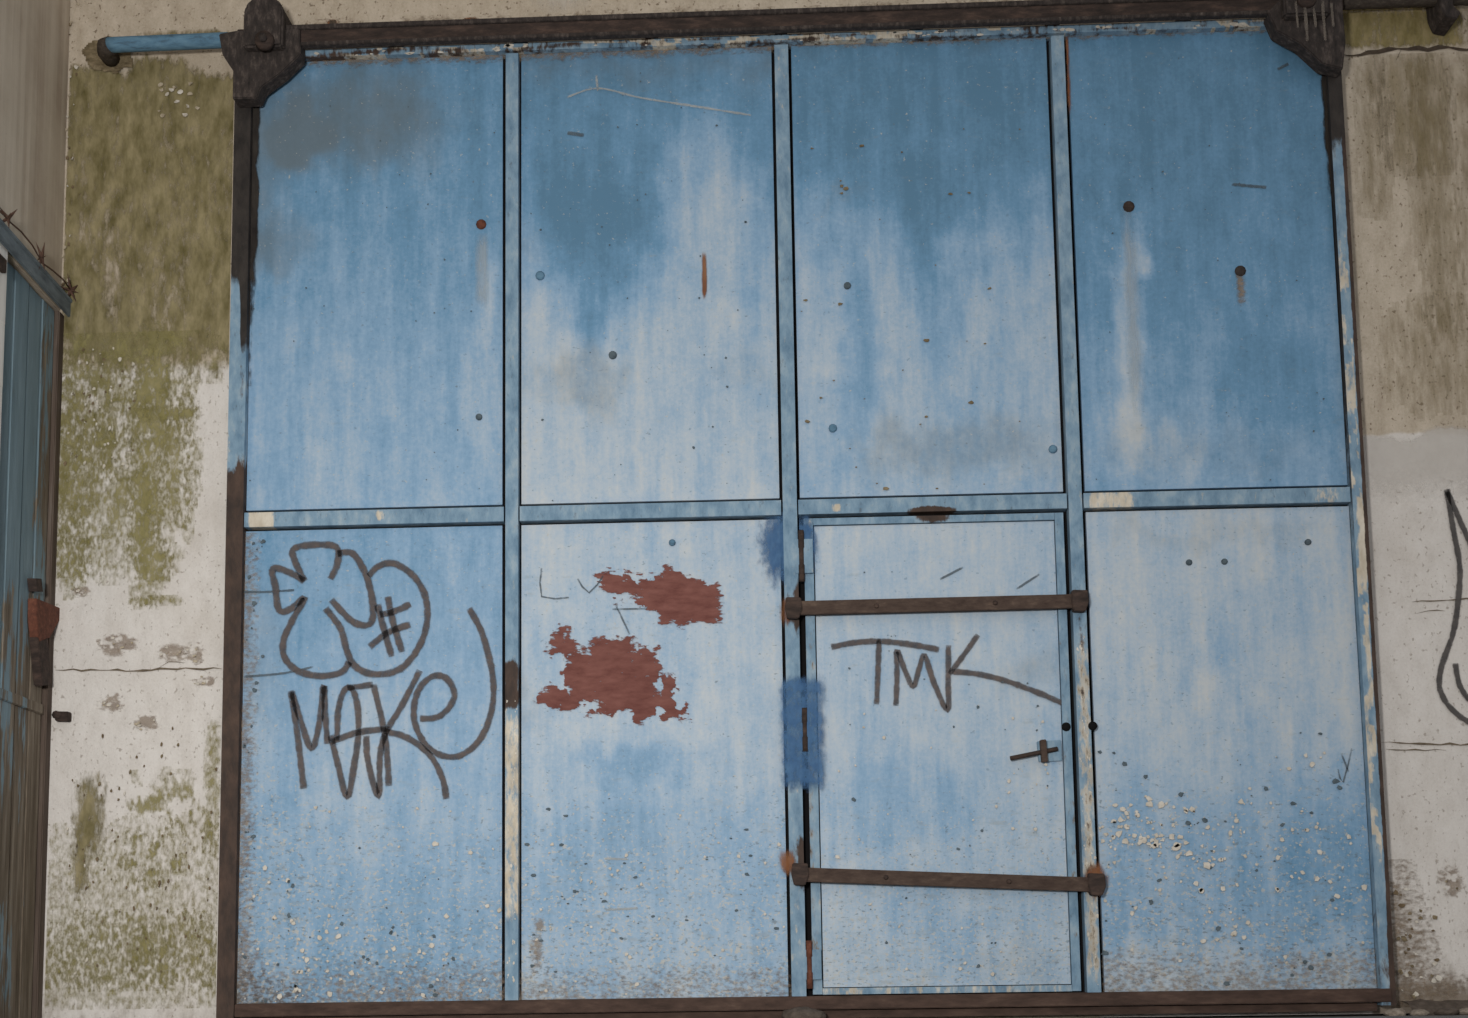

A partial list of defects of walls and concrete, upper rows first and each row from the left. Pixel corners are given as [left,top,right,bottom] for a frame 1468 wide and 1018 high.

crack [1346,45,1468,60]
leakage [57,333,201,596]
leakage [72,775,105,892]
leakage [119,726,220,889]
leakage [131,932,177,988]
peeling [1389,859,1462,1007]